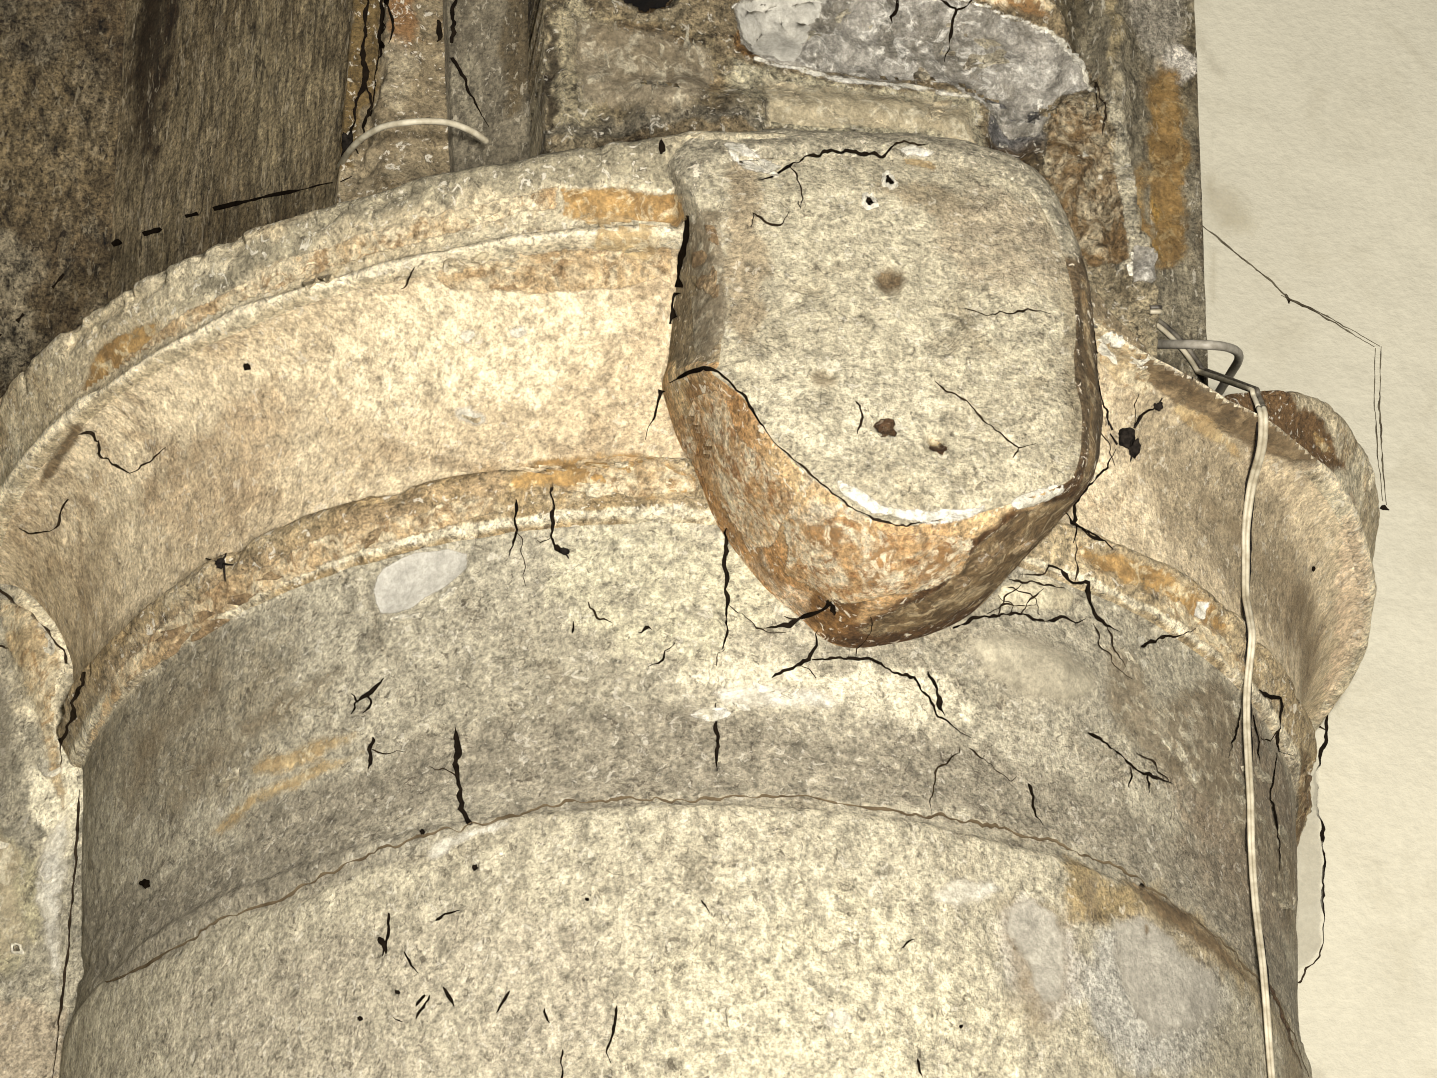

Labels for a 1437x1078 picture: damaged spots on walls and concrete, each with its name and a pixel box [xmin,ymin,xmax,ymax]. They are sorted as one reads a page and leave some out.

crack [436,0,489,127]
crack [751,140,926,226]
corrosion [1135,68,1191,268]
crack [19,499,69,534]
crack [79,431,166,474]
crack [953,331,1196,679]
crack [0,589,86,1078]
crack [105,528,1328,1078]